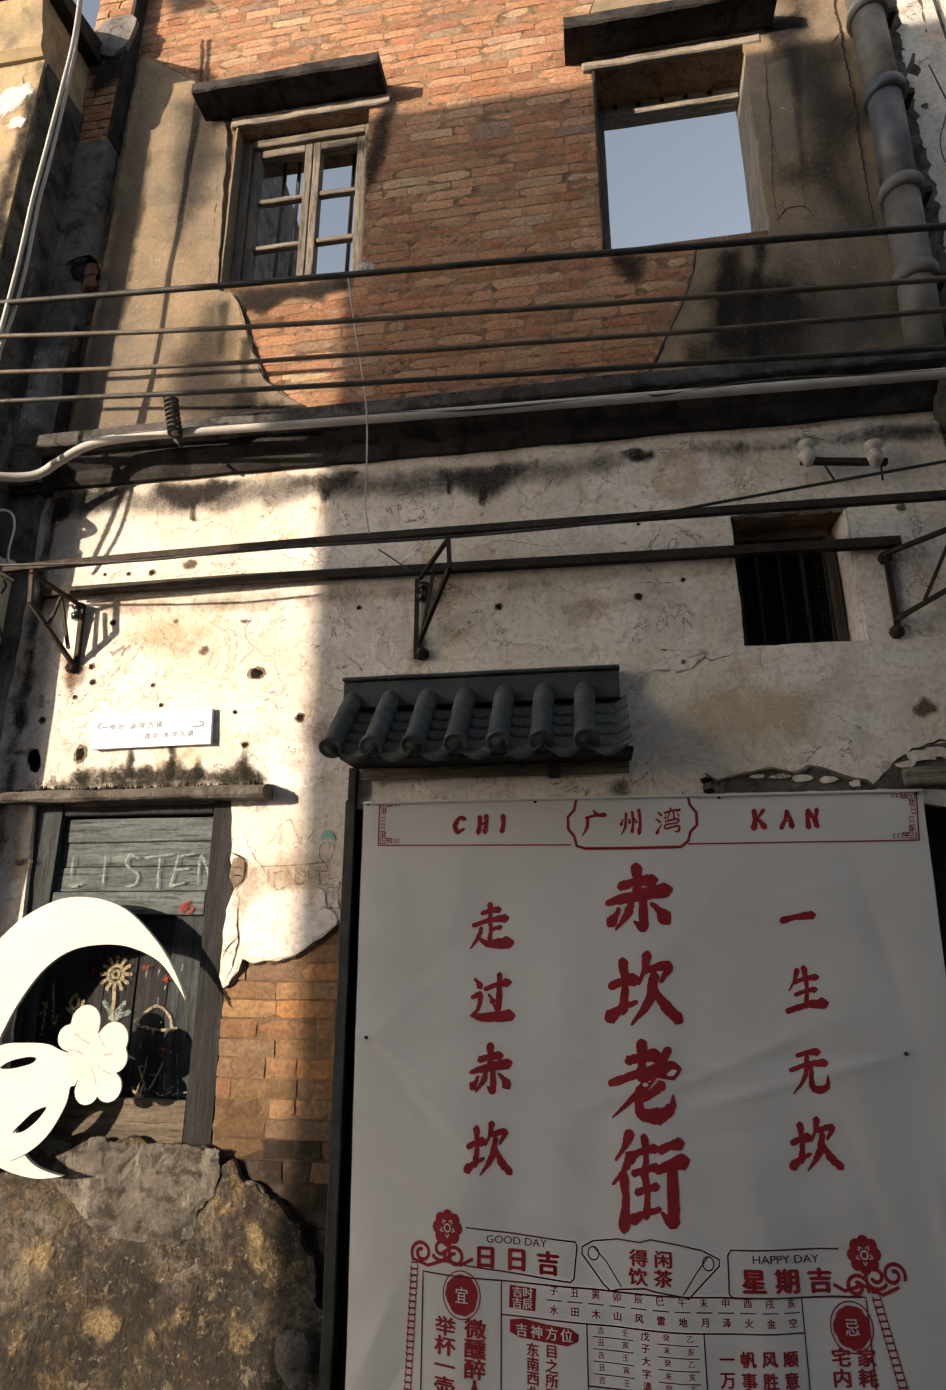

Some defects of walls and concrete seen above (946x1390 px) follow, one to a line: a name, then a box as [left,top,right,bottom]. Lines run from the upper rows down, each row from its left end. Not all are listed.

spalling [79,67,119,154]
damp [91,56,124,92]
damp [177,104,223,216]
damp [198,68,211,80]
spalling [94,0,697,407]
spalling [67,255,104,292]
damp [60,106,130,433]
damp [687,244,896,367]
damp [0,448,653,850]
spalling [870,739,946,790]
spalling [212,889,340,1305]